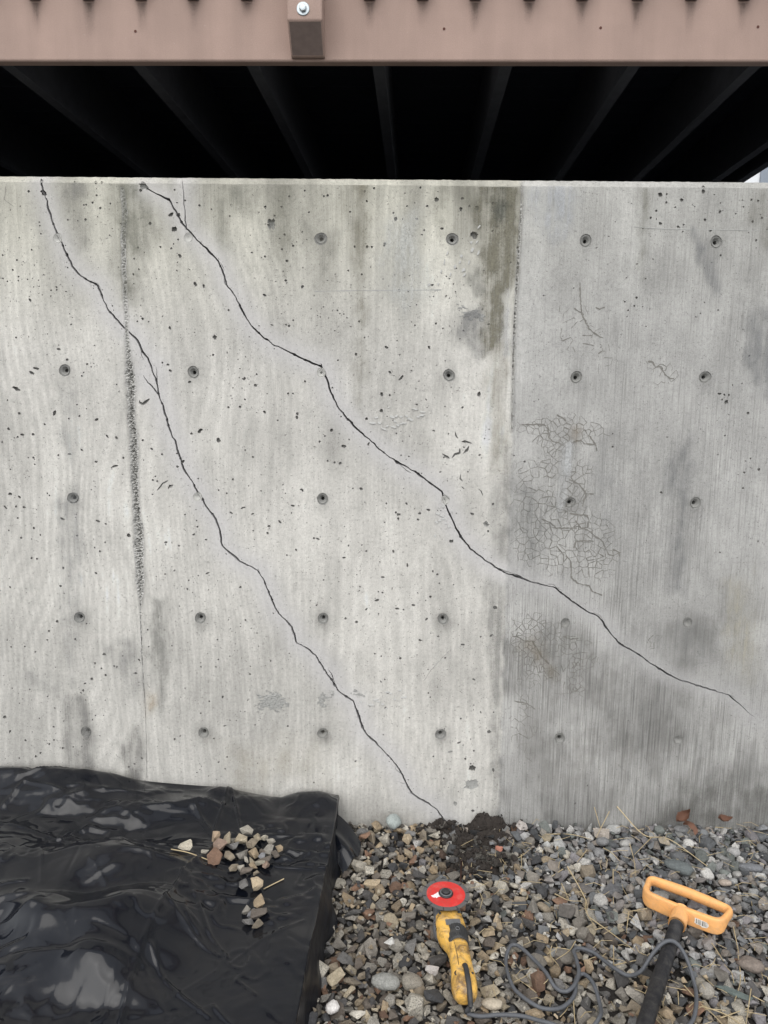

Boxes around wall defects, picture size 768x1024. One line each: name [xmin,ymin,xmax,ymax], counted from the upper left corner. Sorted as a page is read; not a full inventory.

crack [40,179,445,821]
crack [148,180,753,762]
damp [464,187,519,353]